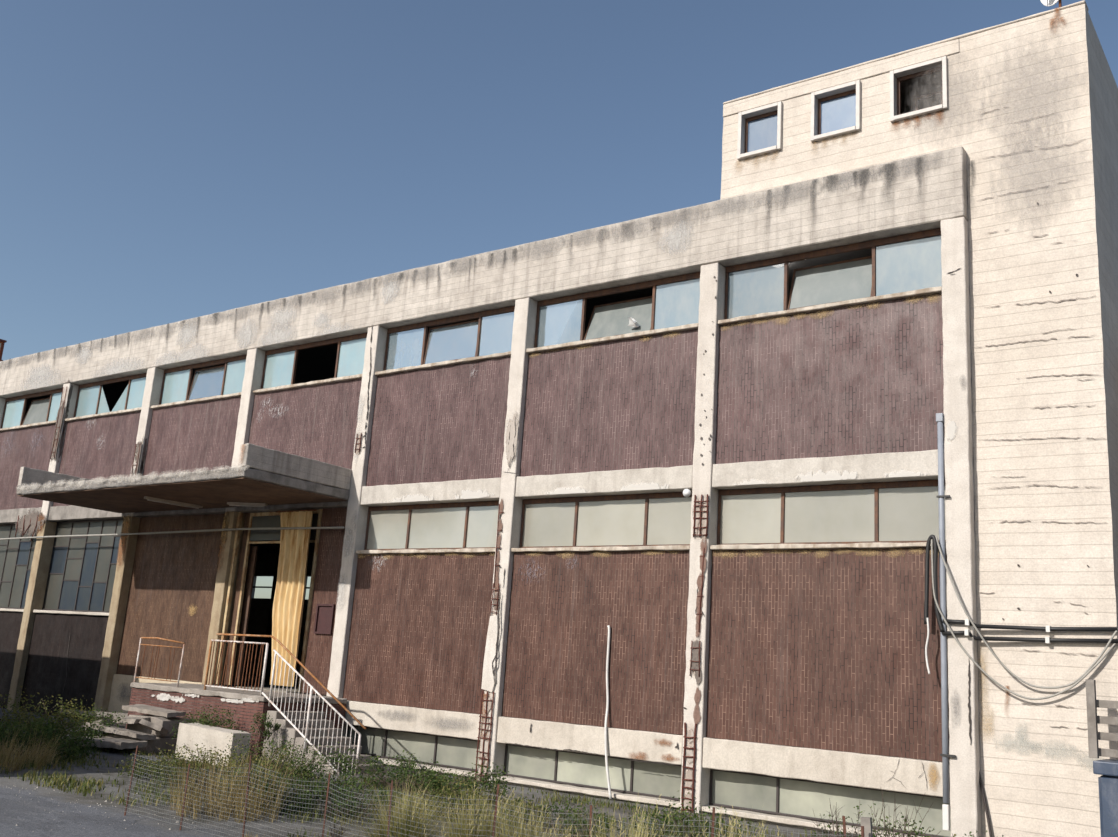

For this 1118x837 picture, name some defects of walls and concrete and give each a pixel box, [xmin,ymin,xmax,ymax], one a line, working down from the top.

leakage [767,169,868,205]
leakage [884,157,936,184]